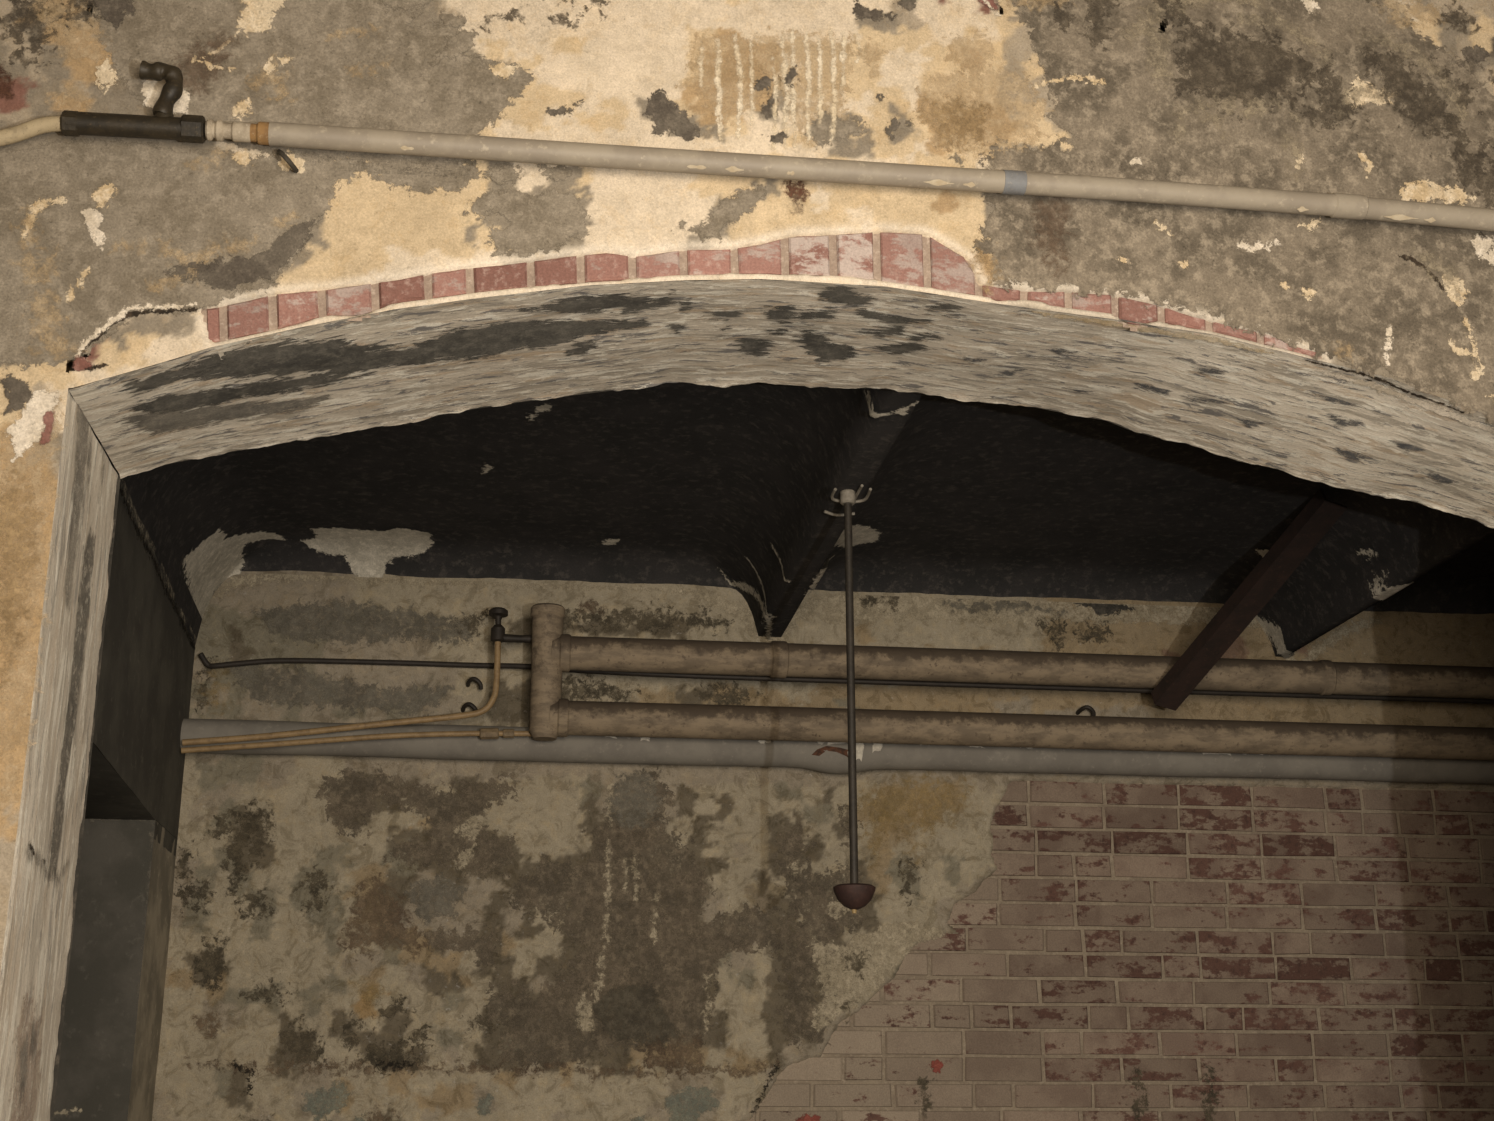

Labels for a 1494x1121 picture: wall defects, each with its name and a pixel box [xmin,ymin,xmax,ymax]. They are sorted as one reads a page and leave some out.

damp [0,0,118,108]
damp [140,79,191,114]
damp [479,6,525,33]
damp [548,0,608,30]
damp [676,27,881,149]
damp [1052,0,1120,51]
damp [1427,56,1494,209]
peeling [0,0,1494,463]
peeling [1427,469,1461,484]
peeling [183,524,1221,642]
spalling [315,764,1494,1121]
damp [190,930,435,1121]